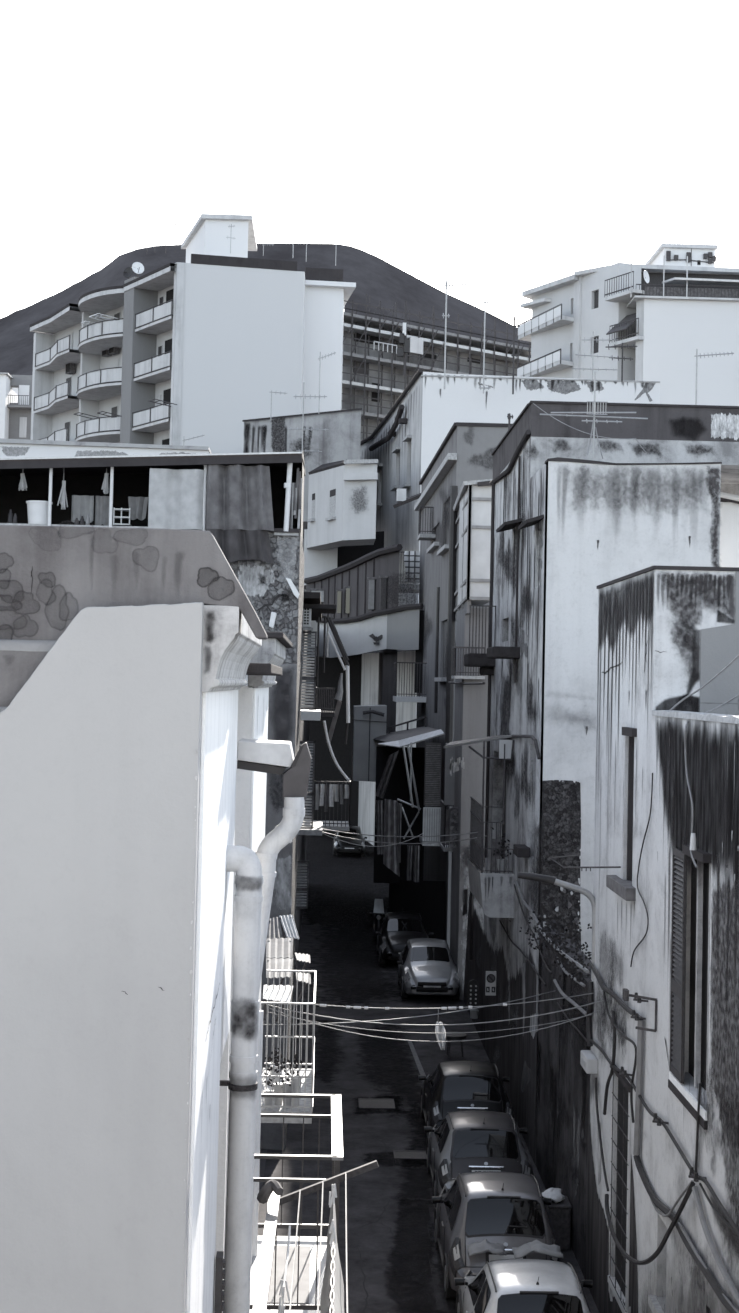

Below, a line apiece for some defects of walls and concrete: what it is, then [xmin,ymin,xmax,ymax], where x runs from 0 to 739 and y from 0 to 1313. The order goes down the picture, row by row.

leakage [197,567,235,669]
peeling [238,564,289,603]
peeling [460,779,583,1166]
leakage [597,573,739,1256]